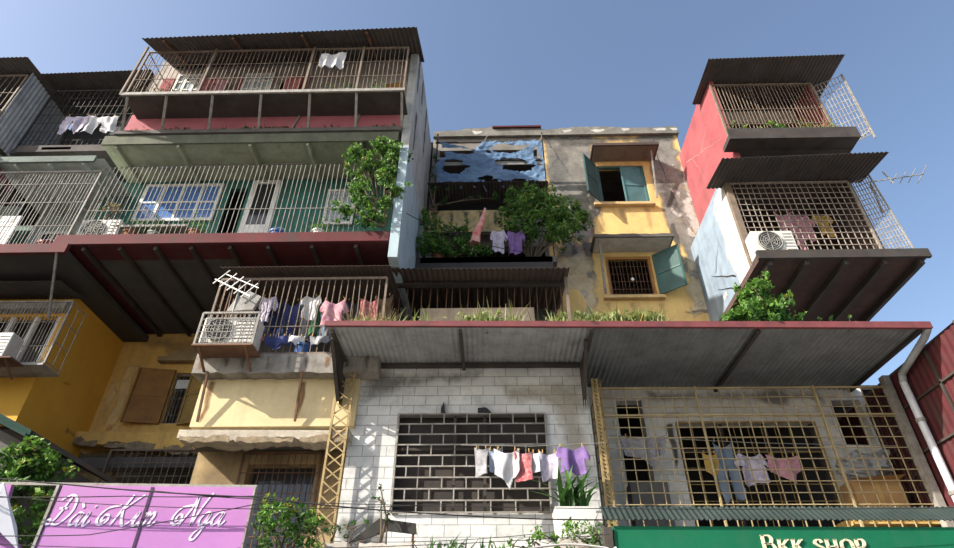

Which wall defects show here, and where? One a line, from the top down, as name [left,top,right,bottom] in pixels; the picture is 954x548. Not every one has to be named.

peeling [670,164,699,238]
peeling [683,260,708,315]
spalling [72,366,345,454]